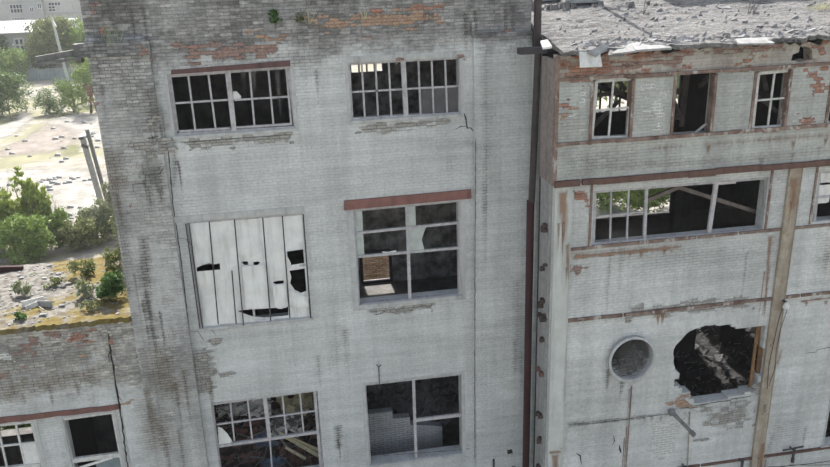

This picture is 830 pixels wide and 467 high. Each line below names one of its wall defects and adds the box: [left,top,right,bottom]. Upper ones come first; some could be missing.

spalling [296,3,446,38]
spalling [803,40,830,96]
crack [455,113,476,250]
corrosion [558,192,678,269]
damp [123,239,165,341]
spalling [0,328,97,379]
crack [108,334,129,467]
crack [381,284,476,458]
peeling [665,382,761,428]